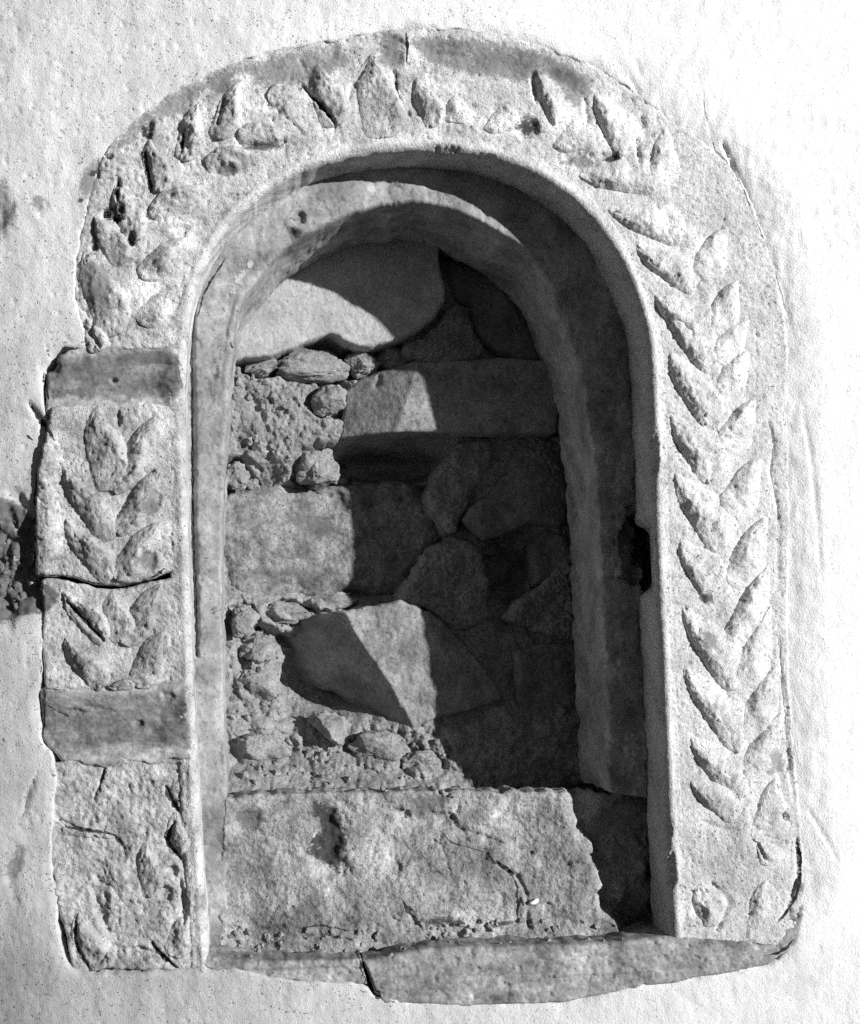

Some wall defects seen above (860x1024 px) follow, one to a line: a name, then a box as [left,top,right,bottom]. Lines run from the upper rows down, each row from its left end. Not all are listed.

spalling [0,498,58,624]
crack [33,468,167,589]
crack [301,924,381,1000]